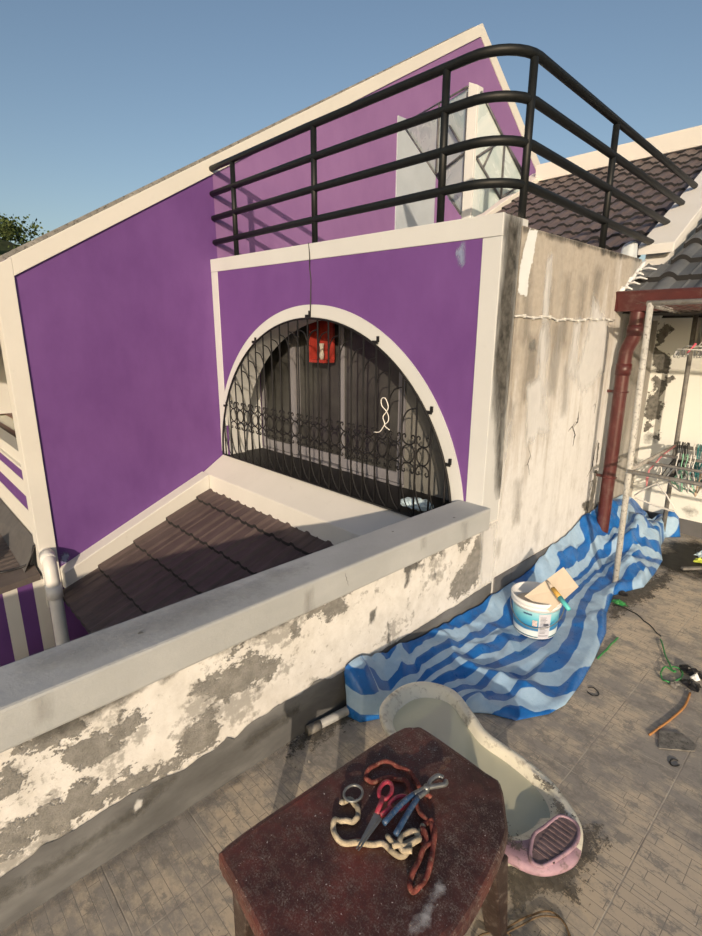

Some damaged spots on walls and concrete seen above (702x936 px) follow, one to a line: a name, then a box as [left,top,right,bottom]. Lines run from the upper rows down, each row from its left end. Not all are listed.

damp [494,212,529,496]
damp [527,258,552,443]
crack [569,403,598,496]
peeling [285,593,351,640]
peeling [447,531,484,603]
peeling [0,642,285,863]